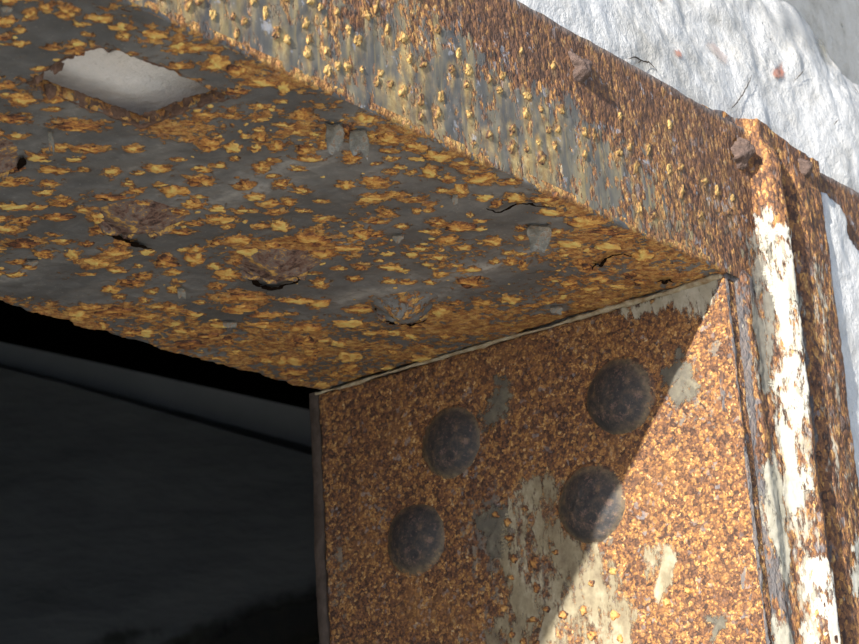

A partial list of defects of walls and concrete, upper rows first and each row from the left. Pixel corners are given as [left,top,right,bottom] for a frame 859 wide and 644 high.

corrosion [184,0,217,20]
corrosion [307,0,340,28]
corrosion [0,3,129,71]
corrosion [302,17,312,59]
corrosion [345,25,363,46]
corrosion [385,24,408,44]
corrosion [523,92,544,119]
corrosion [507,124,561,165]
corrosion [615,143,651,175]
corrosion [0,30,527,389]
corrosion [473,178,647,314]
corrosion [631,249,654,262]